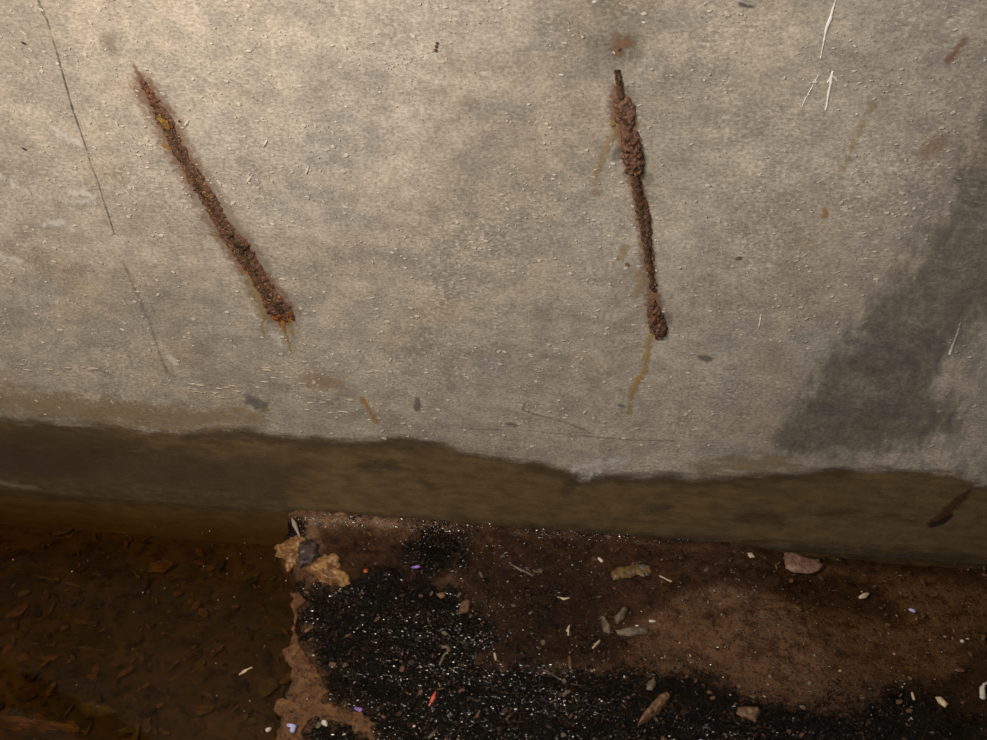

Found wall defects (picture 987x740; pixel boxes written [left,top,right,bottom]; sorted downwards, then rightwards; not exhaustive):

crack [38,0,117,234]
leakage [0,112,987,569]